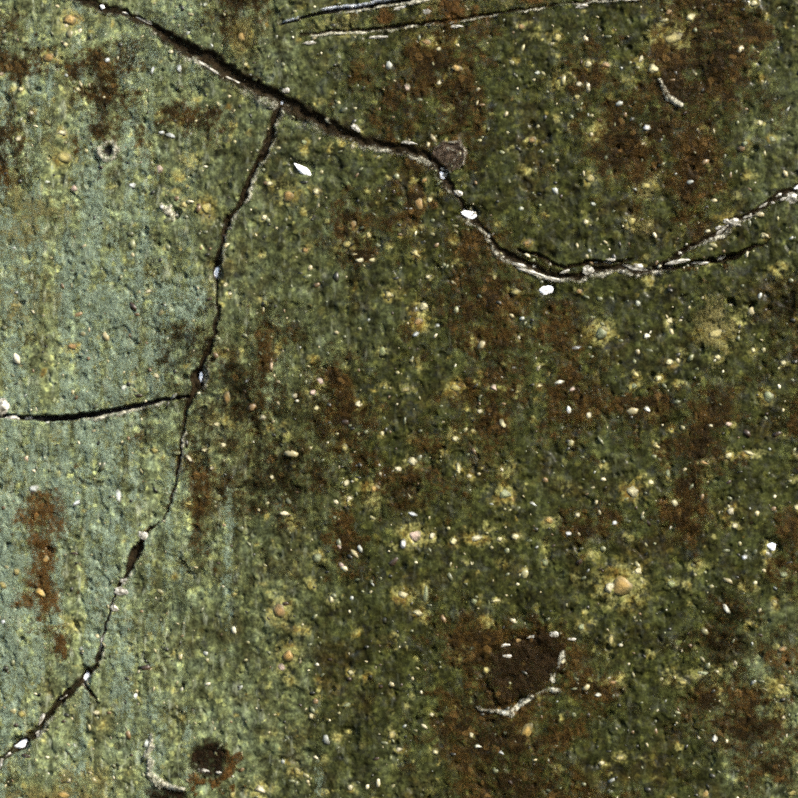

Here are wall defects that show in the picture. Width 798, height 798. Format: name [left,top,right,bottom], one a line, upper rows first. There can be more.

crack [74,0,798,295]
rust [11,488,66,621]
rust [45,626,67,659]
crack [0,301,220,769]